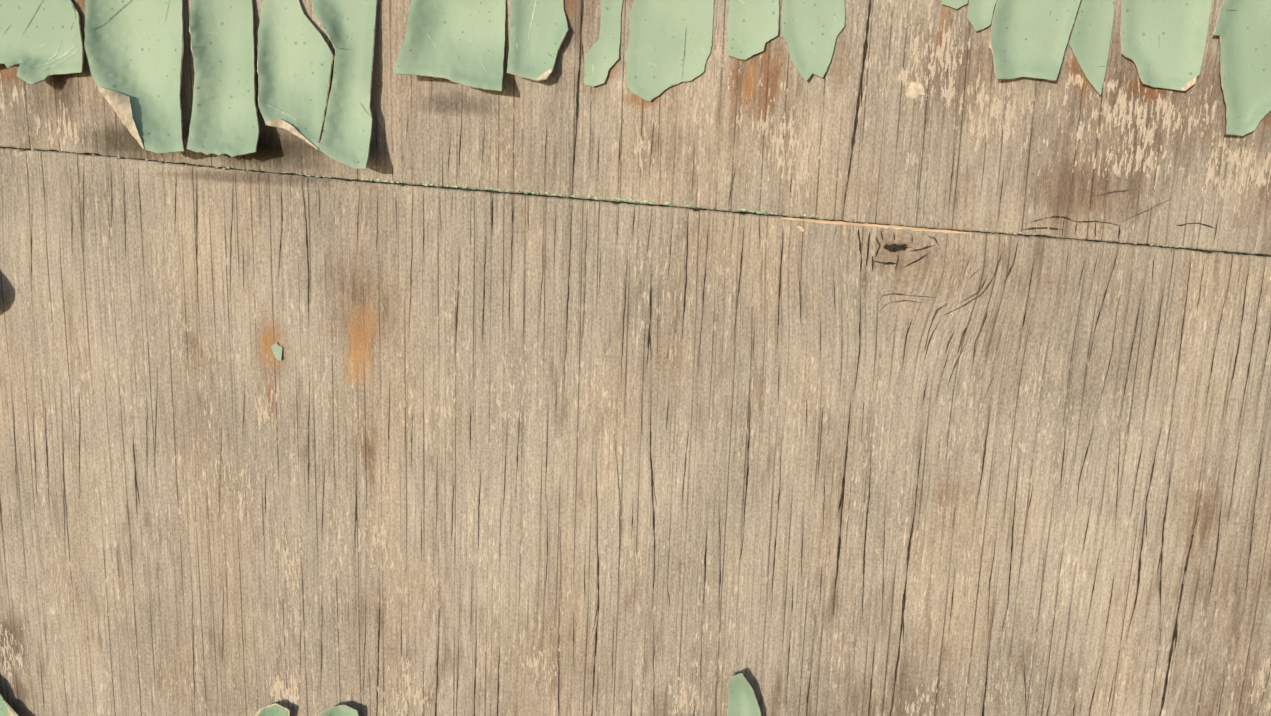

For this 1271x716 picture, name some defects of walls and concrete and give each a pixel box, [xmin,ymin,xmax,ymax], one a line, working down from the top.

peeling [0,0,378,169]
peeling [394,0,569,91]
peeling [584,0,845,101]
peeling [942,0,1271,136]
crack [71,112,142,253]
crack [175,177,198,302]
crack [278,183,320,321]
crack [357,0,1271,716]
crack [0,391,81,529]
crack [308,395,325,529]
peeling [0,694,19,716]
peeling [727,673,761,716]